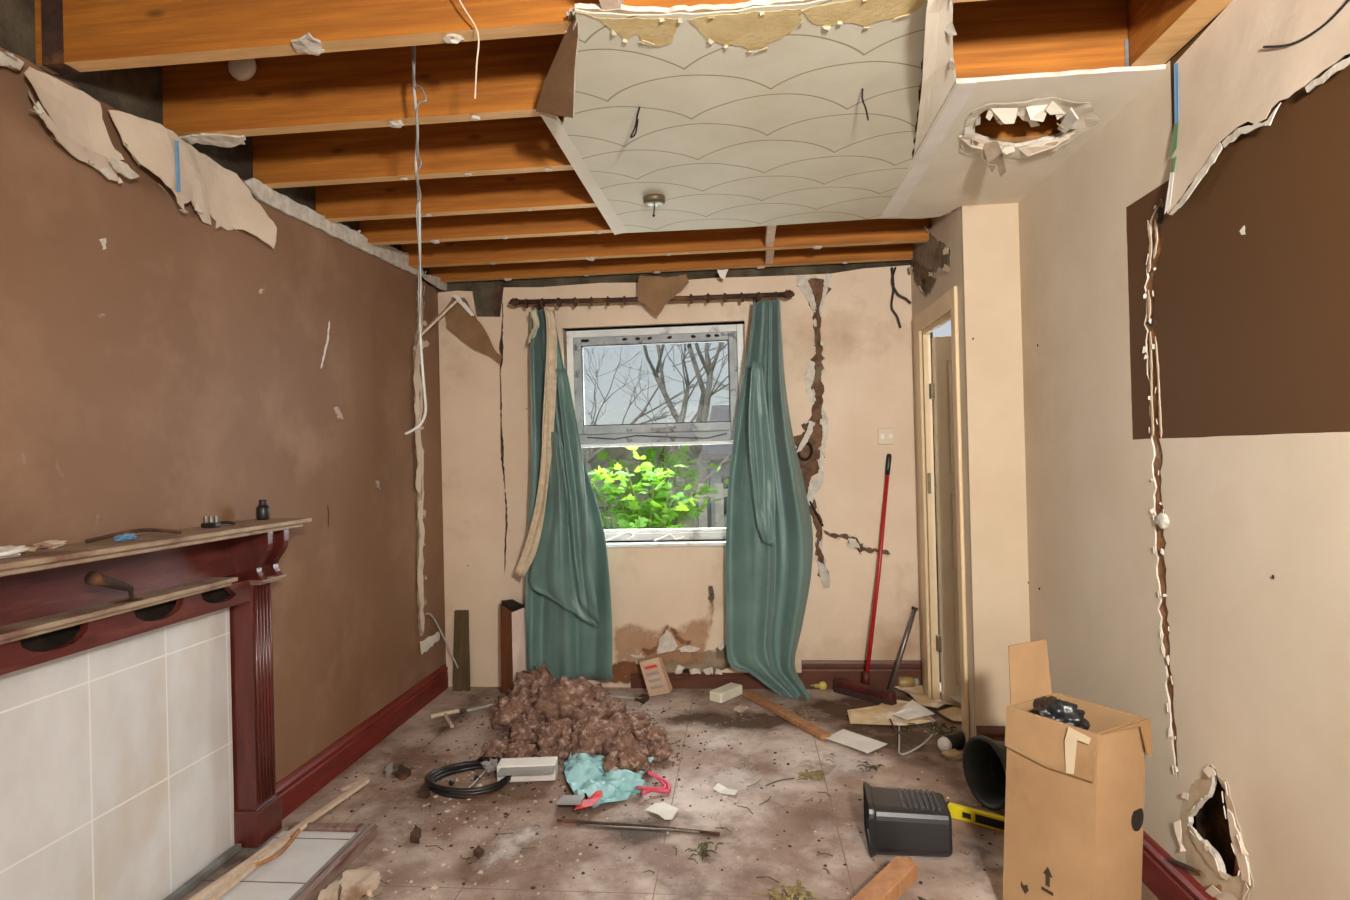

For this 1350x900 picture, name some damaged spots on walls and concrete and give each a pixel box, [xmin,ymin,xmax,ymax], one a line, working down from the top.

peeling [971,109,1004,143]
peeling [999,144,1015,155]
peeling [1020,101,1070,145]
flaking render [908,226,951,292]
crack [493,283,508,573]
crack [793,272,890,588]
crack [1142,198,1178,774]
spalling [631,639,732,678]
hole [1174,764,1254,900]